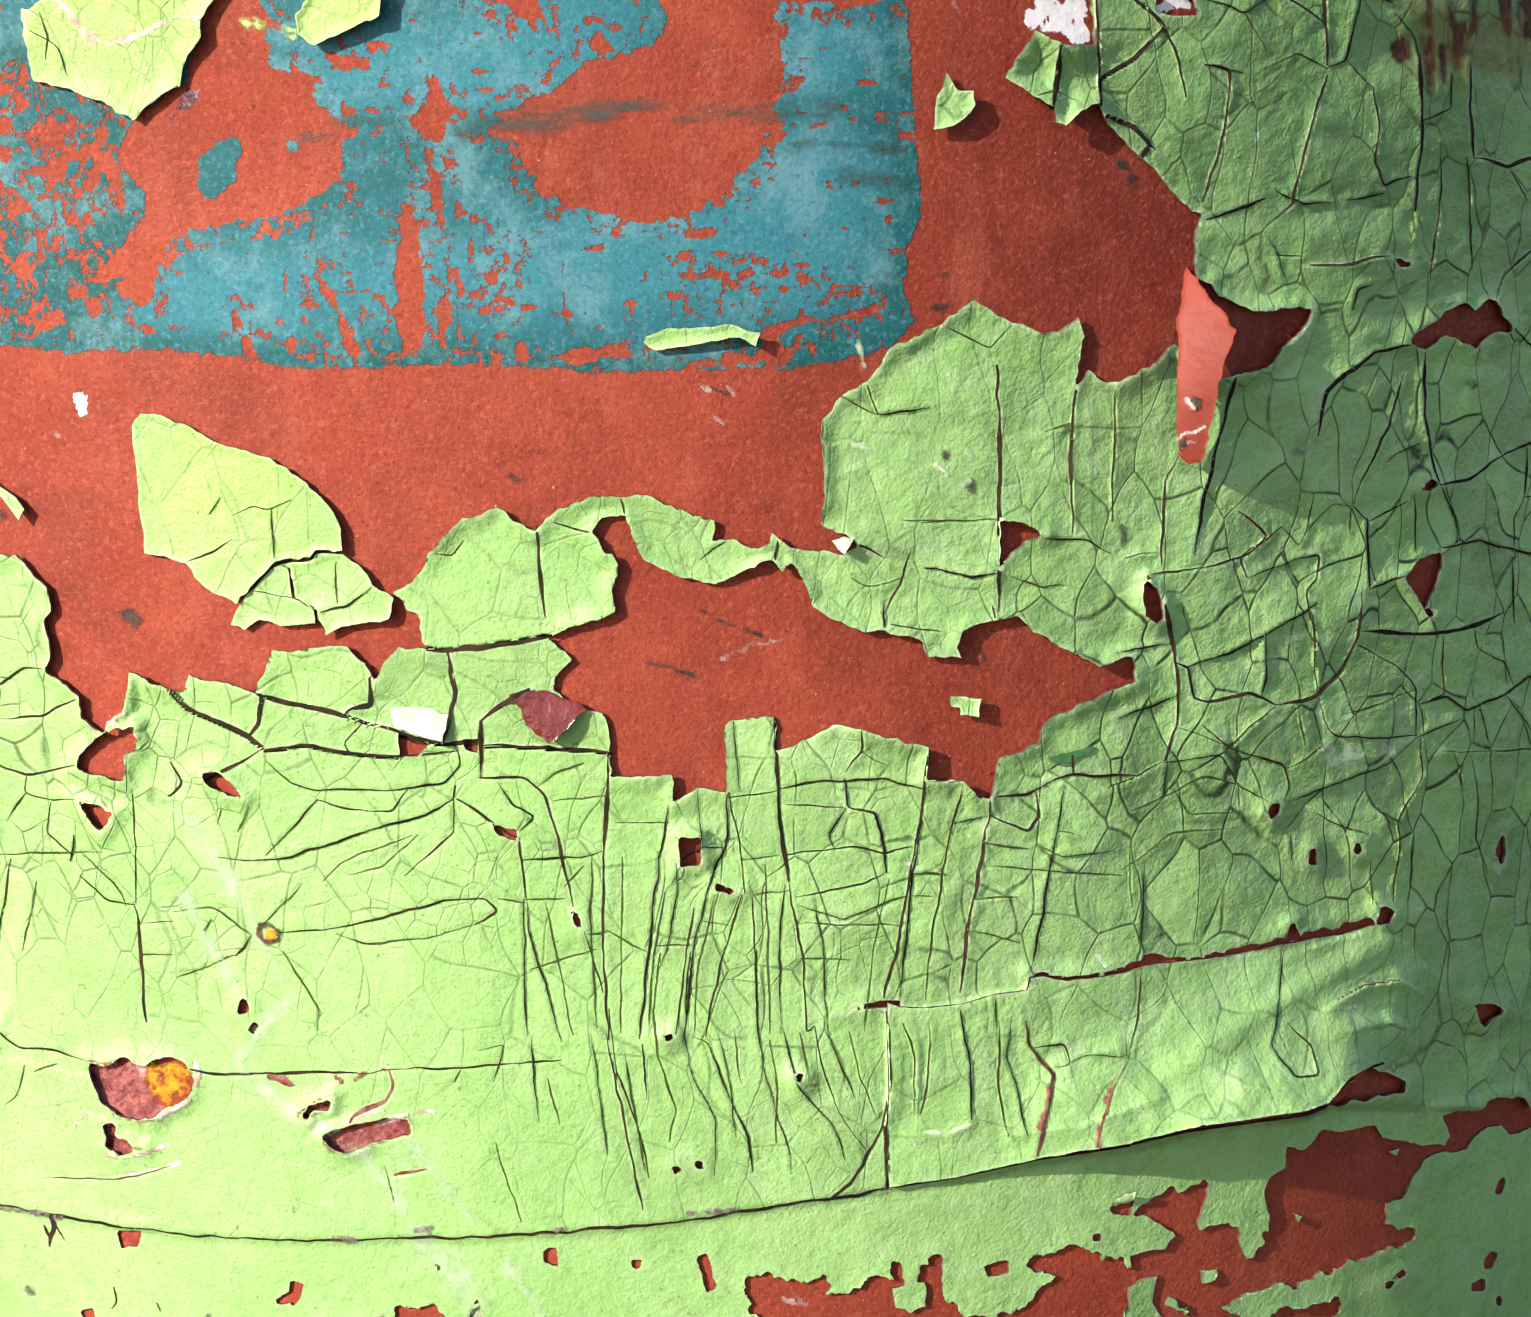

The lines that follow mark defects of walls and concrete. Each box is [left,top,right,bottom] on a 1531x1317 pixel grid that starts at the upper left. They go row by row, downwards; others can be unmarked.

corrosion [1391,0,1477,84]
corrosion [1499,0,1531,39]
crack [1038,0,1531,345]
peeling [1411,299,1510,349]
peeling [0,0,1310,801]
peeling [81,802,112,829]
crack [0,324,1531,1247]
corrosion [256,922,281,945]
corrosion [88,1059,192,1155]
peeling [1315,1062,1404,1111]
peeling [744,1097,1531,1317]
peeling [395,1304,445,1317]